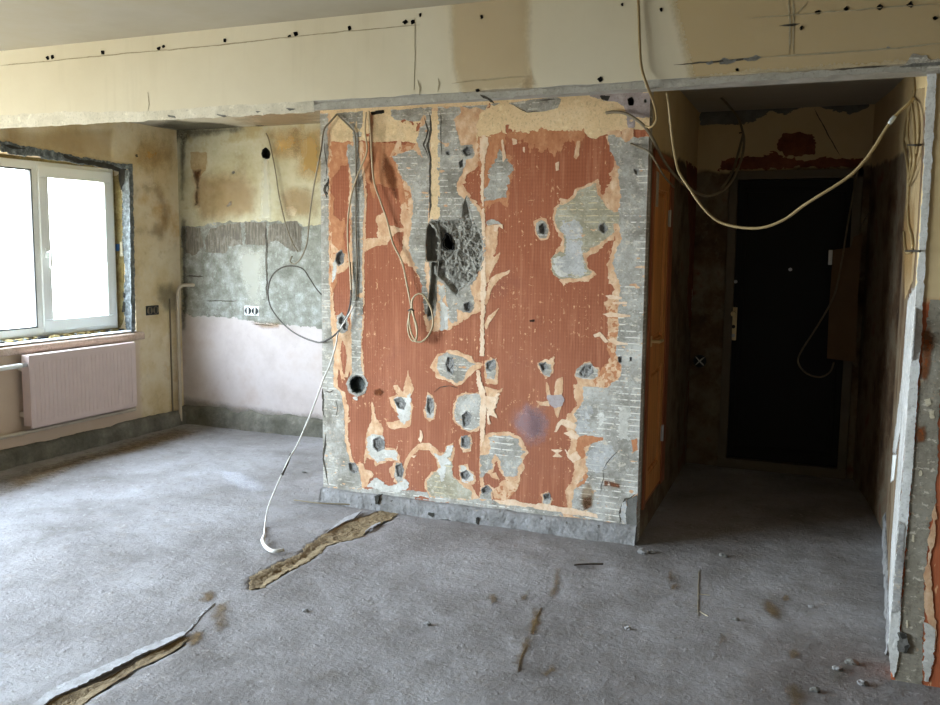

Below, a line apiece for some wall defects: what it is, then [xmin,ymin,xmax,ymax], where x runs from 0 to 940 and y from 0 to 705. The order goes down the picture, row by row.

water stain [159,121,237,167]
flaking render [390,103,500,332]
flaking render [484,149,514,201]
peeling [717,132,863,172]
peeling [181,111,409,504]
flaking render [386,371,414,429]
flaking render [423,350,526,501]
flaking render [537,354,555,379]
flaking render [551,116,649,526]
flaking render [888,73,940,685]
crack [249,510,398,590]
crack [34,591,226,705]